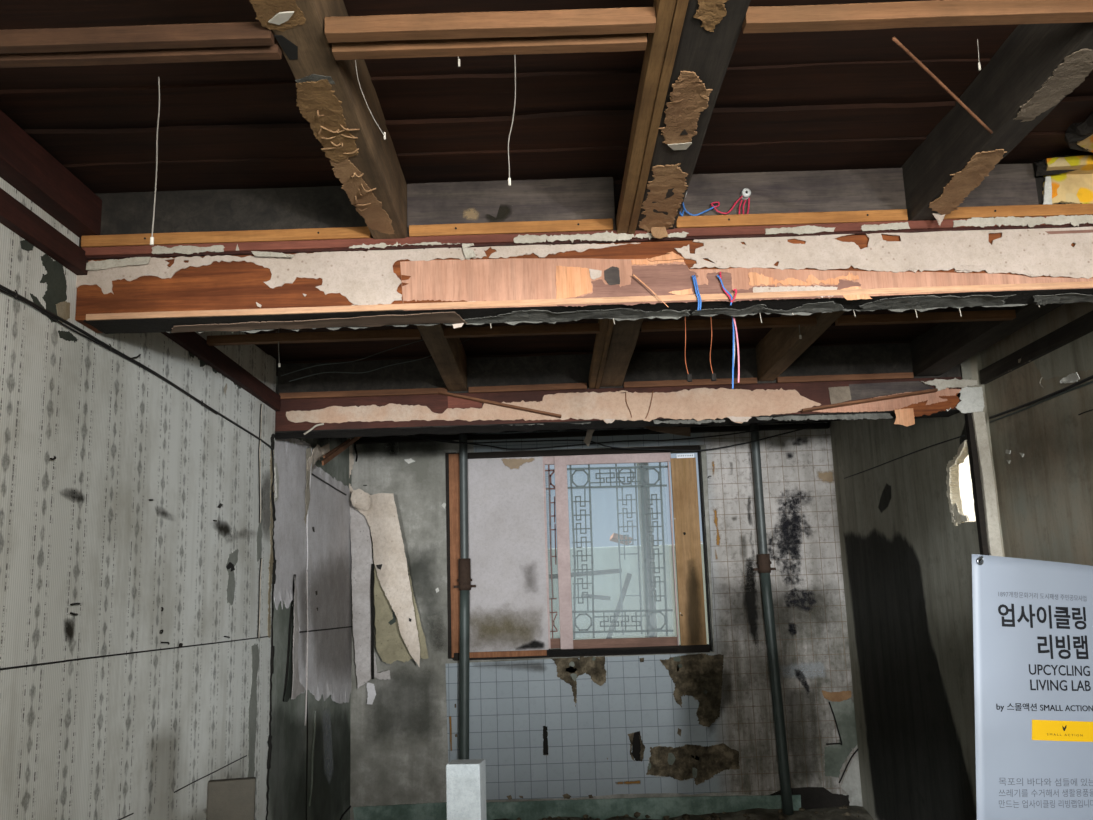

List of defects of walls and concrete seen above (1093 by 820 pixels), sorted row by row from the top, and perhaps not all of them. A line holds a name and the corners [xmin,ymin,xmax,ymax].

peeling [317,110,360,154]
peeling [668,142,692,150]
peeling [351,173,376,212]
peeling [462,243,477,259]
peeling [20,240,78,342]
peeling [84,288,1093,334]
peeling [1033,331,1093,380]
mould [768,491,816,610]
mould [744,551,758,641]
spalling [550,656,606,707]
spalling [660,653,724,727]
spalling [627,728,740,785]